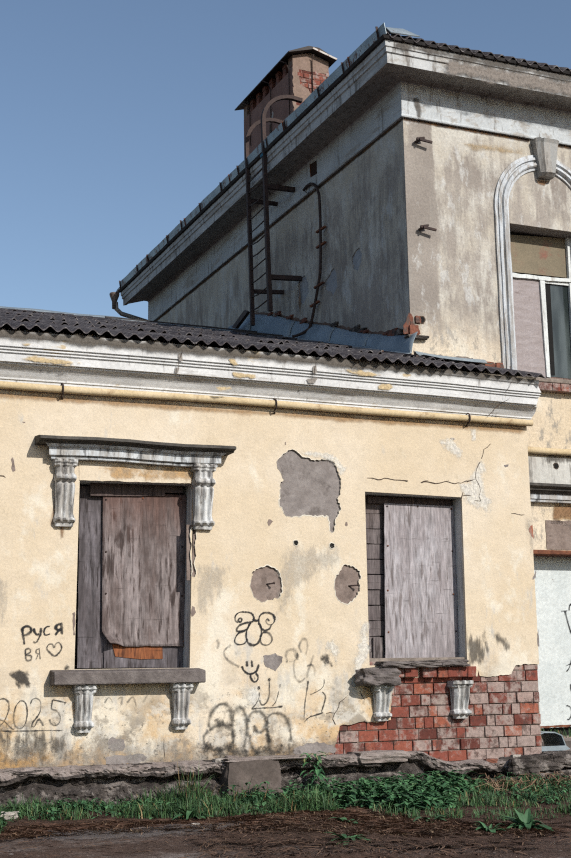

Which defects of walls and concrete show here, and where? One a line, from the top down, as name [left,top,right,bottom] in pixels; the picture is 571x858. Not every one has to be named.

flaking render [297,69,329,93]
crack [373,444,490,501]
flaking render [276,442,348,550]
flaking render [250,565,283,603]
flaking render [334,564,362,605]
flaking render [293,664,542,761]
water stain [0,733,64,758]